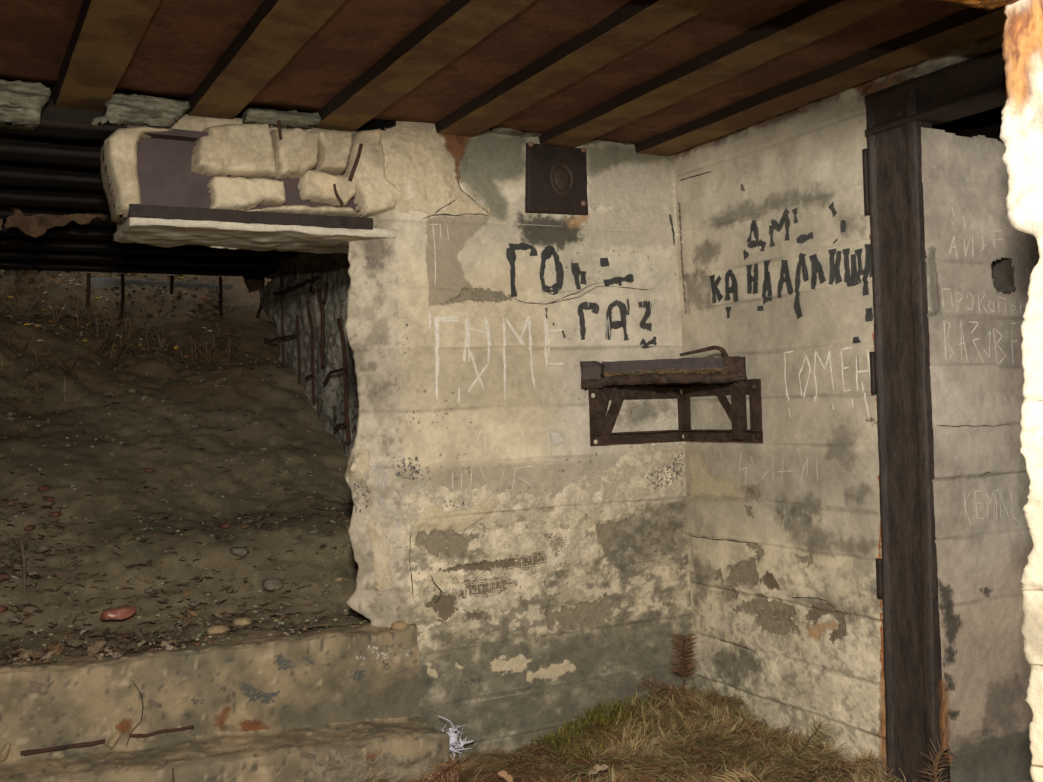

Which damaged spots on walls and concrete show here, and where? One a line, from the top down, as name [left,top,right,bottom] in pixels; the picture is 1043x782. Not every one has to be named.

rust [1001,0,1043,106]
water stain [458,134,525,218]
water stain [589,146,673,172]
peeling [392,441,686,631]
peeling [741,484,761,518]
peeling [714,542,848,644]
peeling [426,662,481,688]
peeling [490,654,577,683]